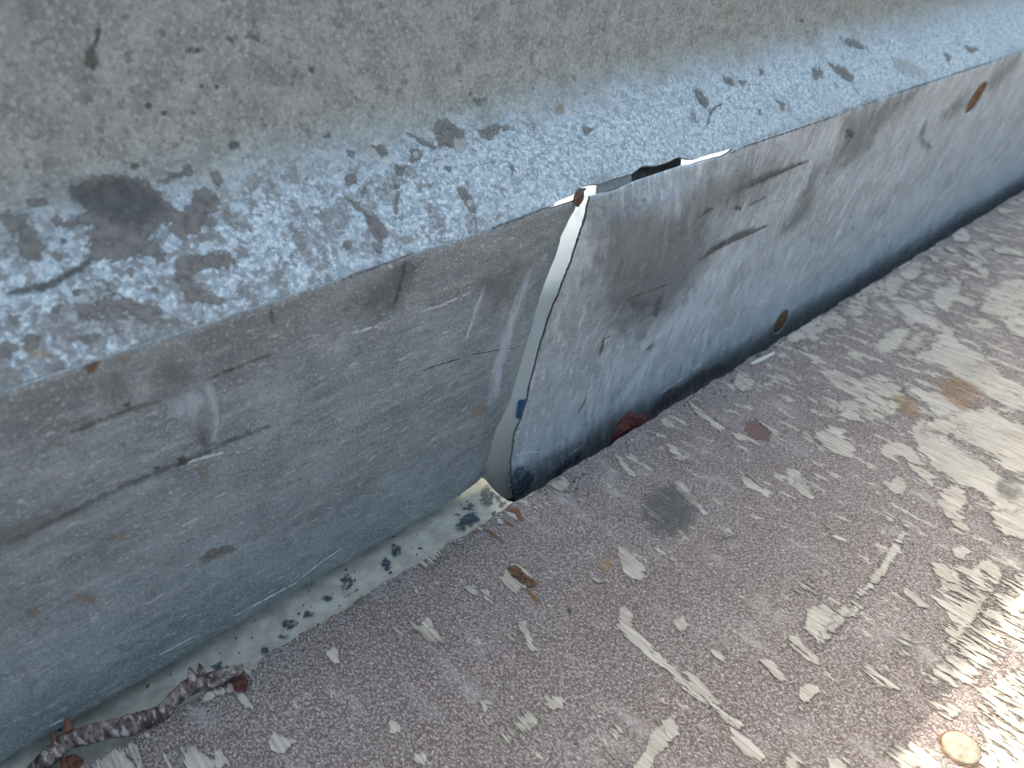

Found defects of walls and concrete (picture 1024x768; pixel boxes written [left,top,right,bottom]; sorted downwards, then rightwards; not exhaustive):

crack [732,61,993,153]
rust [965,82,986,113]
crack [492,204,554,229]
rust [573,188,586,207]
crack [341,254,411,280]
rust [774,310,788,332]
crack [509,202,588,501]
peeling [688,222,1024,768]
peeling [617,543,647,582]
peeling [463,563,539,605]
peeling [604,606,808,768]
peeling [494,693,566,755]